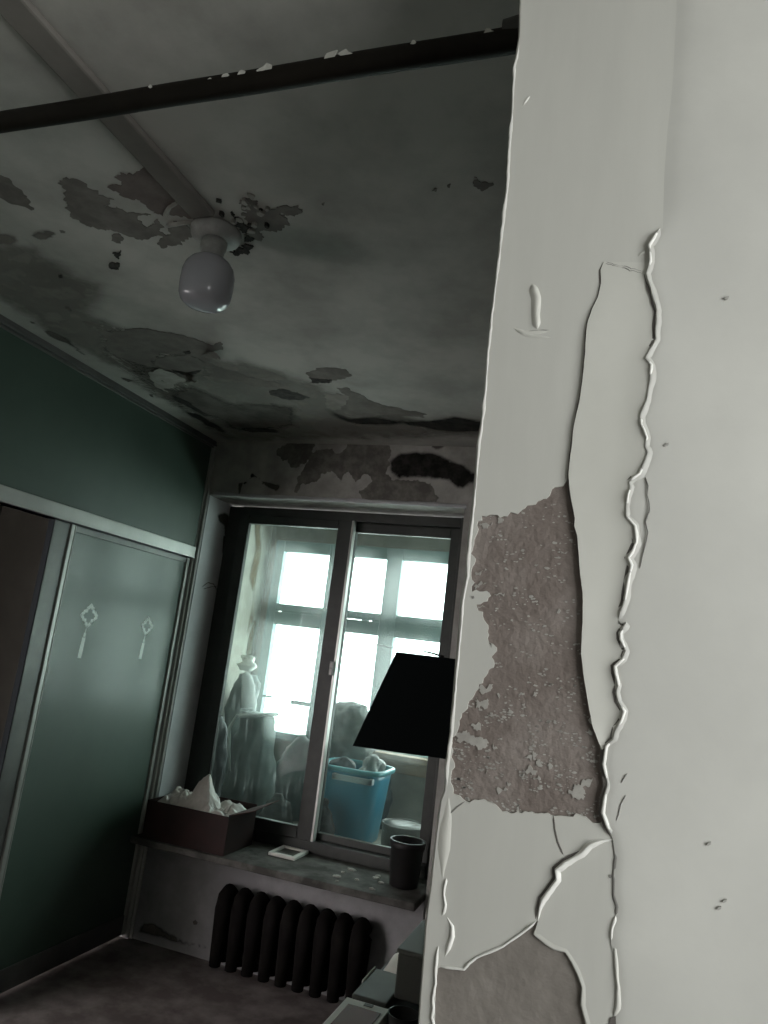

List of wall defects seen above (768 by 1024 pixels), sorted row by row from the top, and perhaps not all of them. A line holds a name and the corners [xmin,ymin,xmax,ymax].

peeling [0,175,34,210]
peeling [58,167,196,270]
peeling [216,192,303,256]
water stain [0,230,480,488]
peeling [276,443,439,502]
peeling [306,367,427,418]
peeling [445,47,656,823]
crack [535,228,662,1024]
crack [430,878,455,1024]
peeling [435,921,590,1024]